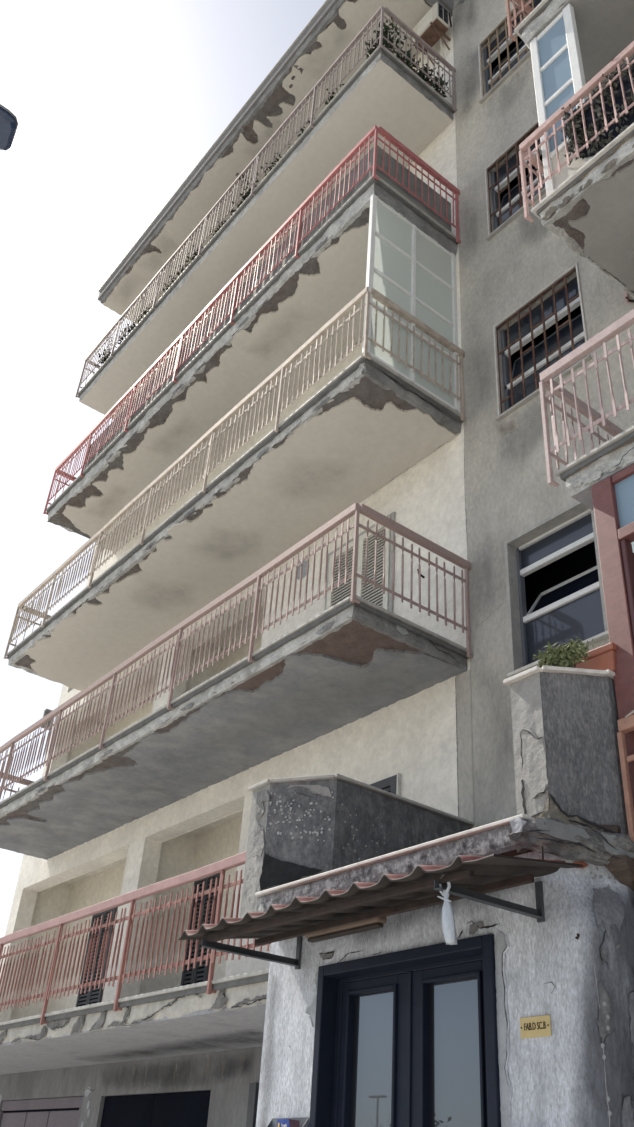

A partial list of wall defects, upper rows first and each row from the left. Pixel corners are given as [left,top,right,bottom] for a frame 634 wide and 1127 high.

spalling [325,13,346,29]
spalling [223,64,303,156]
spalling [541,144,634,294]
spalling [47,196,371,533]
spalling [43,362,457,638]
spalling [8,655,35,668]
spalling [154,620,459,732]
spalling [0,742,138,824]
peeling [288,785,332,798]
crack [520,734,629,835]
spalling [507,817,634,869]
peeling [593,887,624,938]